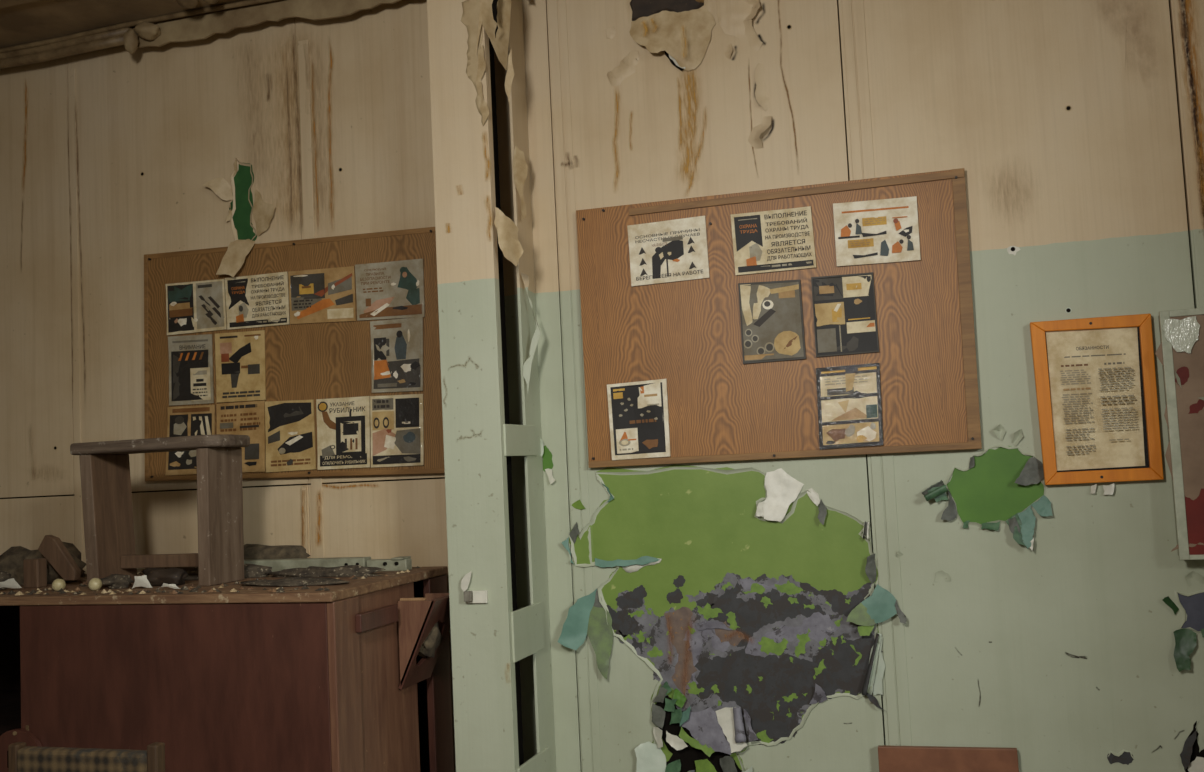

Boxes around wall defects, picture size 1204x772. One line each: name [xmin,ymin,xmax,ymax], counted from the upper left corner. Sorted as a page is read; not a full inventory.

peeling [461,0,514,126]
peeling [625,0,716,71]
corrosion [298,53,332,215]
corrosion [679,74,706,189]
peeling [203,158,275,277]
peeling [494,145,541,395]
peeling [1155,315,1204,500]
peeling [922,443,1053,550]
peeling [558,464,907,772]
peeling [1163,590,1204,672]
peeling [1180,721,1204,772]